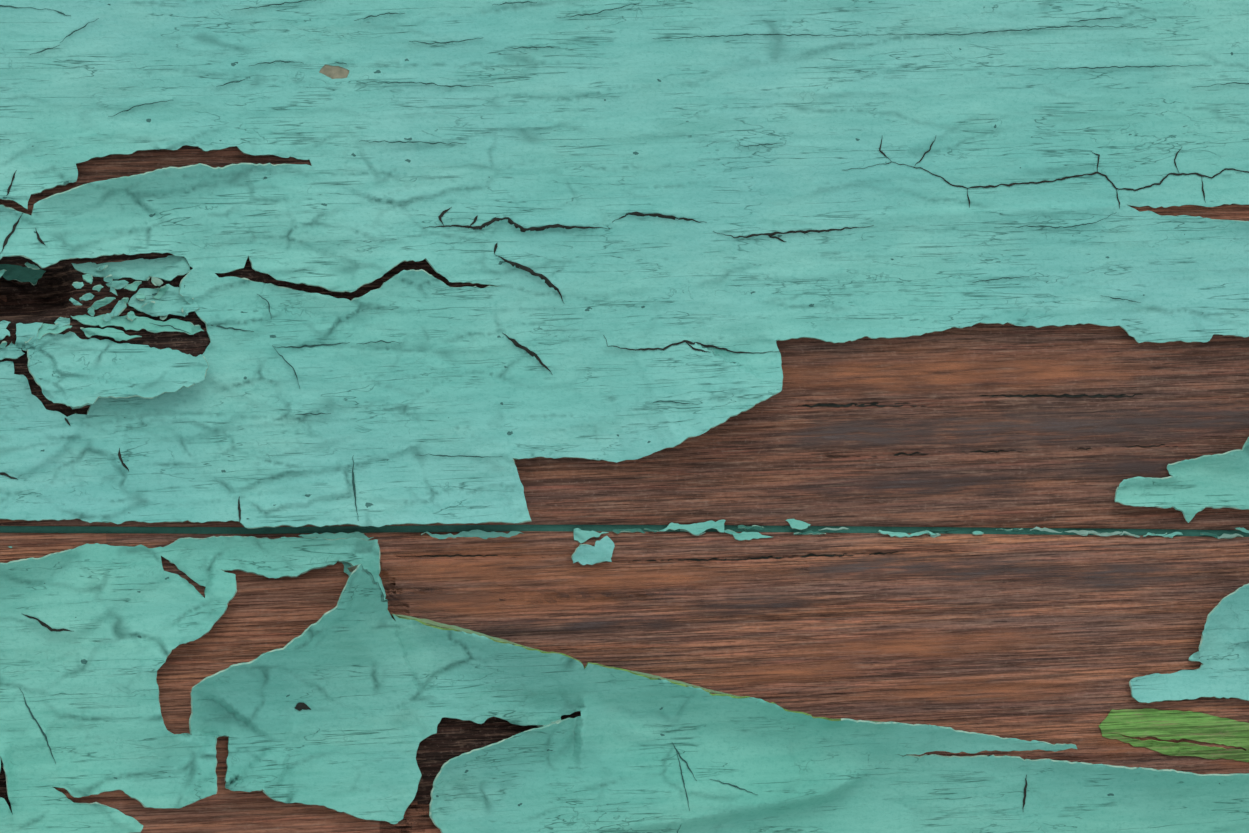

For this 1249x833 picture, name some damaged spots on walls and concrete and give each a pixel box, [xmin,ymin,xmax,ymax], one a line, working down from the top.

peeling [0,124,334,235]
peeling [0,235,514,408]
crack [425,207,874,303]
crack [972,275,1030,283]
crack [848,137,1249,228]
peeling [1115,191,1249,242]
peeling [0,301,1249,833]